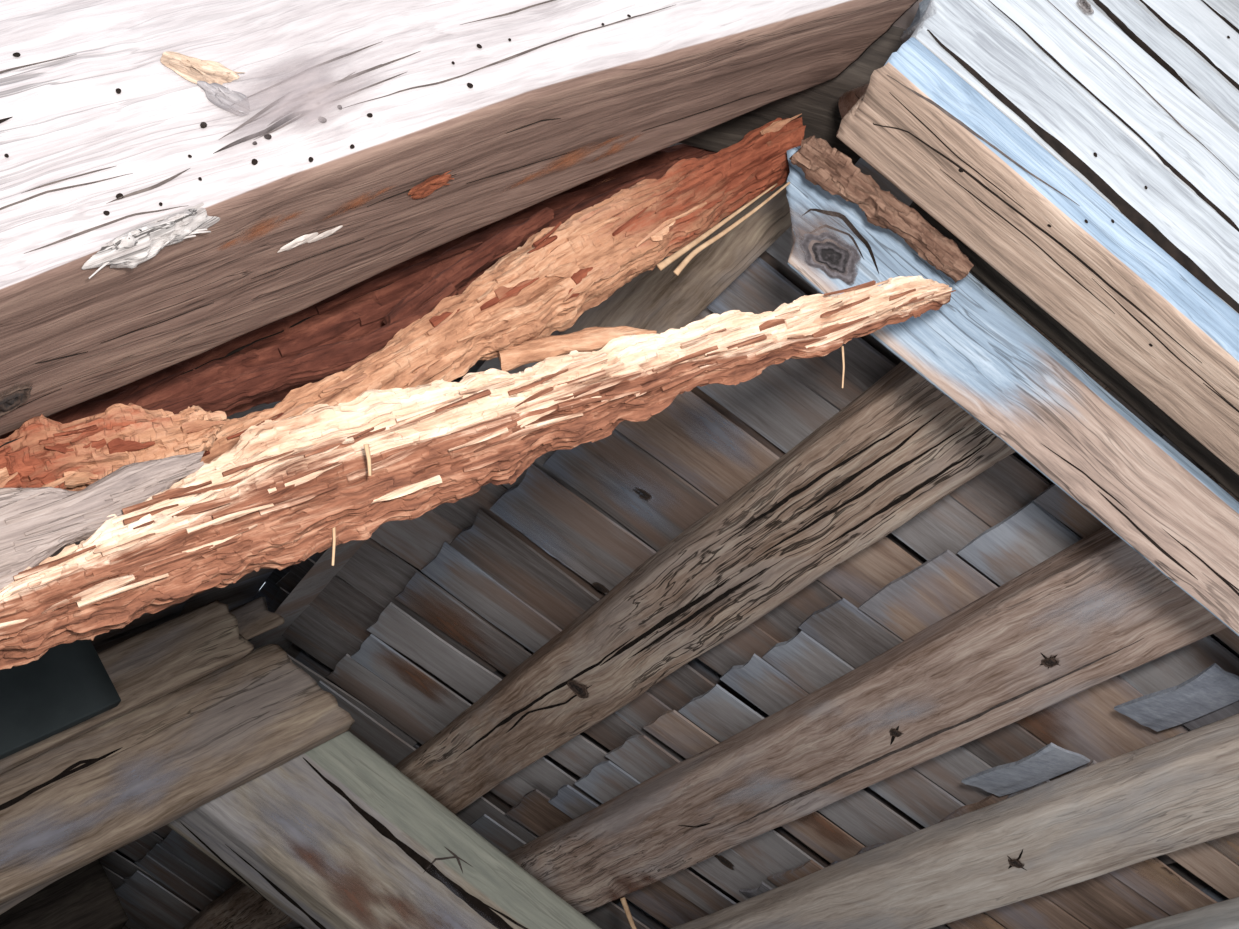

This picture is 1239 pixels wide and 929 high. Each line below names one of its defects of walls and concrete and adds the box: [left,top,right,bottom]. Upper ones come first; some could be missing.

peeling [760,113,802,135]
spalling [82,202,220,279]
peeling [277,147,758,358]
peeling [0,280,956,629]
crack [457,409,986,758]
crack [0,747,123,811]
corrosion [332,873,412,929]
crack [303,758,528,929]